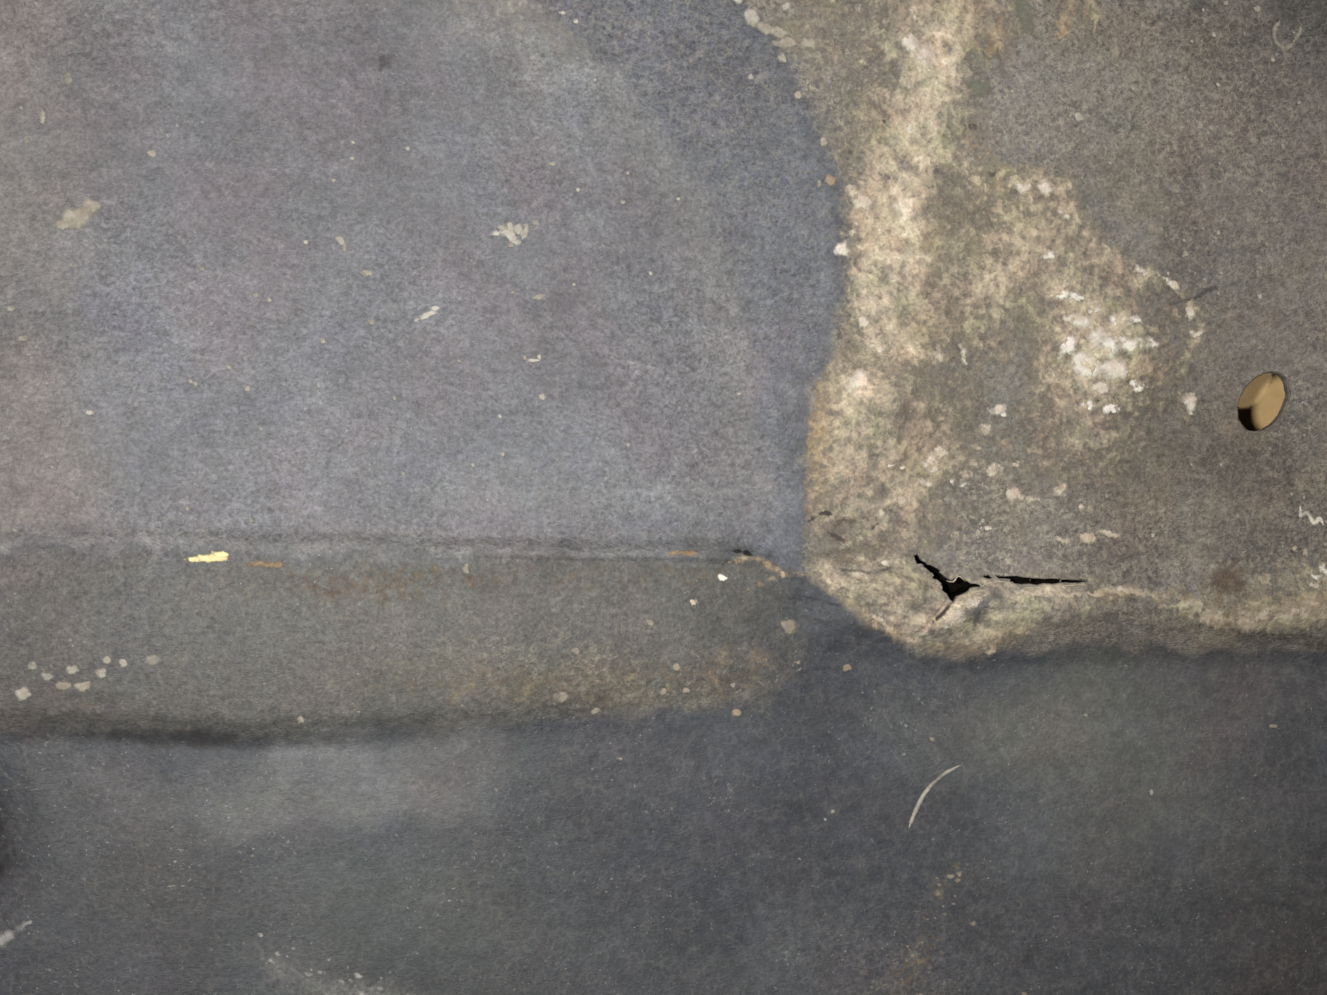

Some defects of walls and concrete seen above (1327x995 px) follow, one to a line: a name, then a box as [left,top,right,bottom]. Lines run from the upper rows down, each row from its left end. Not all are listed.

water stain [776,0,1034,373]
crack [914,555,1085,602]
water stain [0,920,32,947]